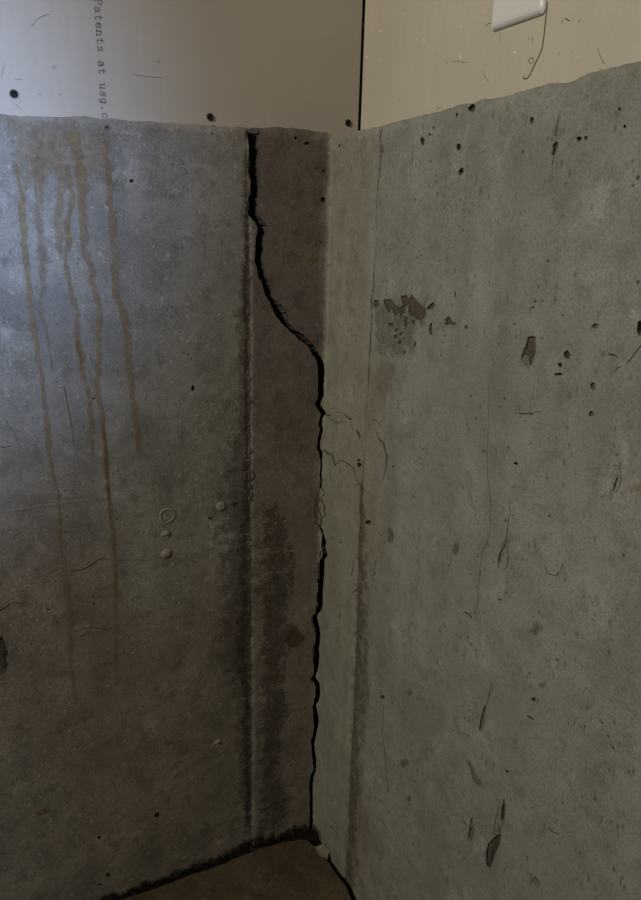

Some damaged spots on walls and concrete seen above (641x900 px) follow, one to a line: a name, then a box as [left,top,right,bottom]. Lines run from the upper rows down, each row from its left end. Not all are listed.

corrosion [9,119,140,593]
spalling [373,295,435,354]
spalling [520,336,536,365]
crack [100,127,388,900]
spalling [486,799,505,867]